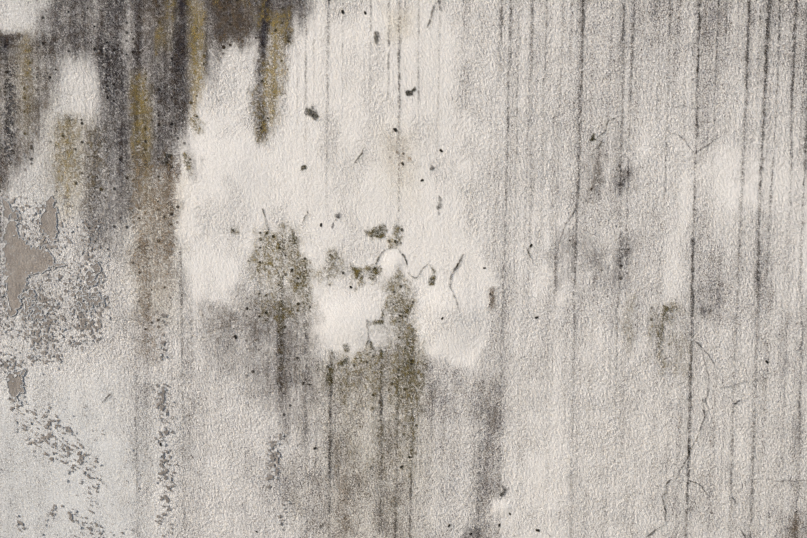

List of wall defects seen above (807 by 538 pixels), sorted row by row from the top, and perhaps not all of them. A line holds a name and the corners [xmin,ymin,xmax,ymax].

leakage [55,0,310,251]
leakage [748,0,780,169]
peeling [0,186,138,538]
crack [649,399,707,536]